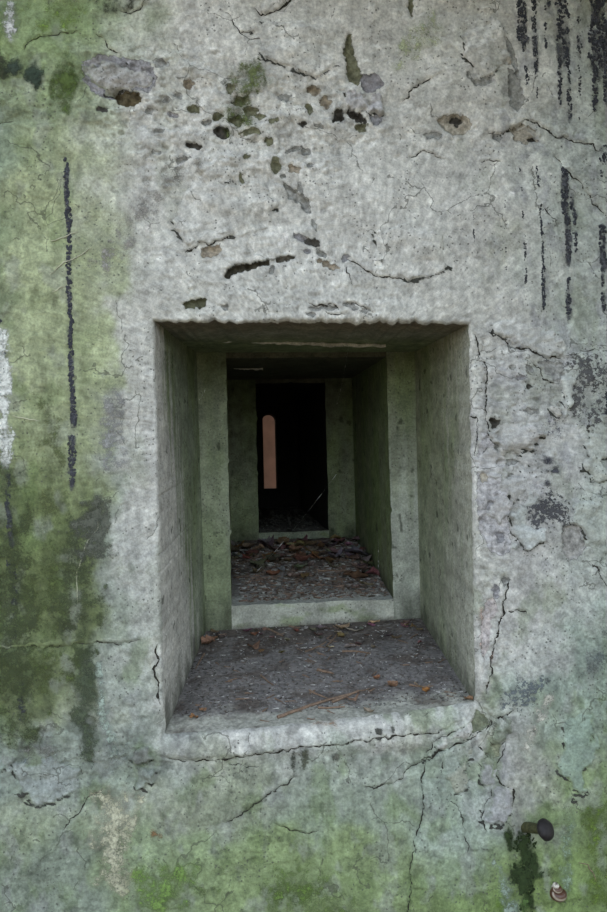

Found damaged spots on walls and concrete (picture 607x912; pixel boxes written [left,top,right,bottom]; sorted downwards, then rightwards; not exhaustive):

spalling [162,79,279,146]
peeling [170,143,351,279]
peeling [250,20,384,132]
crack [478,87,607,218]
water stain [516,0,607,123]
water stain [560,166,578,266]
water stain [33,157,78,491]
crack [504,329,606,384]
spalling [472,364,577,556]
water stain [0,319,57,763]
crack [0,628,166,729]
crack [166,577,535,912]